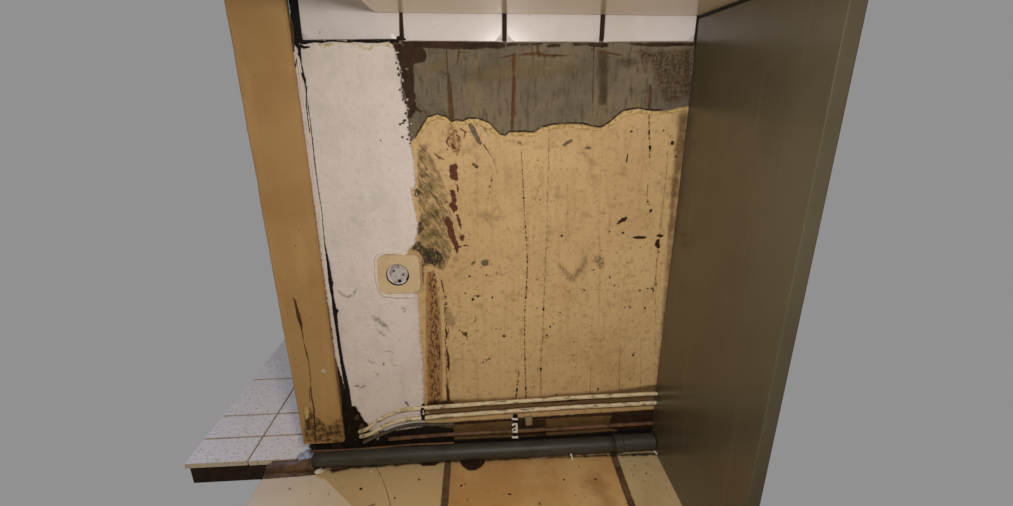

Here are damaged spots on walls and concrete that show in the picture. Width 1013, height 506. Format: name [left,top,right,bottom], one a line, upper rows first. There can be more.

mould [412,222,443,283]
peeling [392,40,695,269]